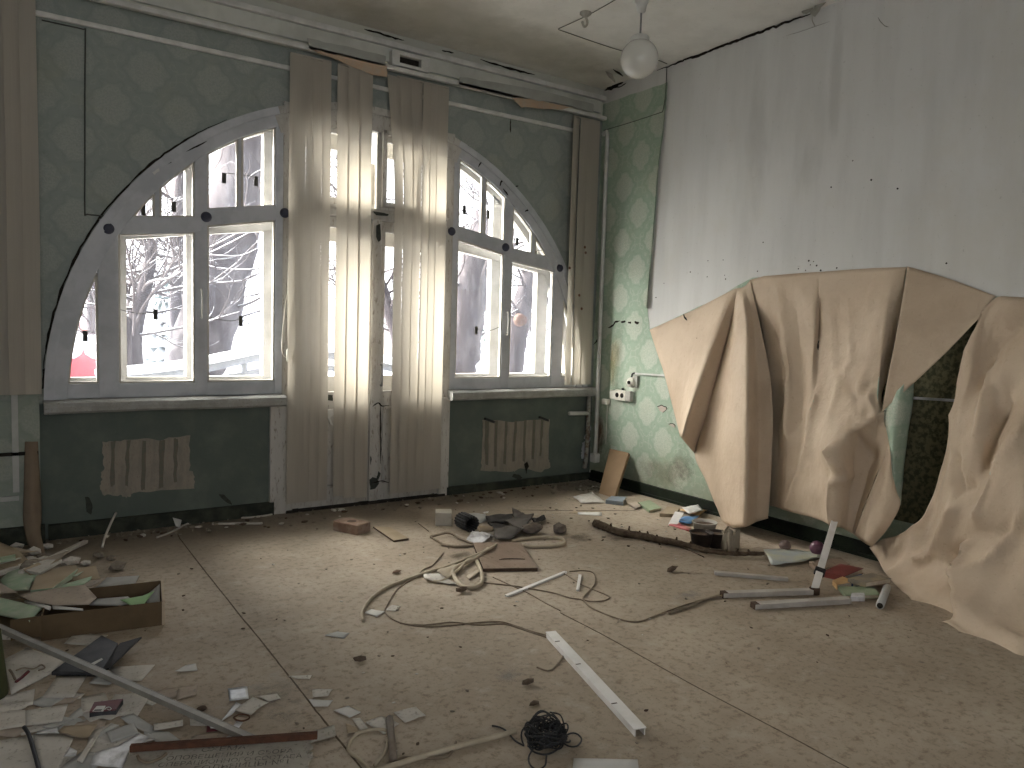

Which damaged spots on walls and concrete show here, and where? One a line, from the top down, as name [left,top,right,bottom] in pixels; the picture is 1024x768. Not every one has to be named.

crack [365,29,402,40]
crack [480,59,535,75]
crack [605,82,626,91]
crack [657,14,830,71]
flaking render [100,435,195,498]
flaking render [480,419,550,473]